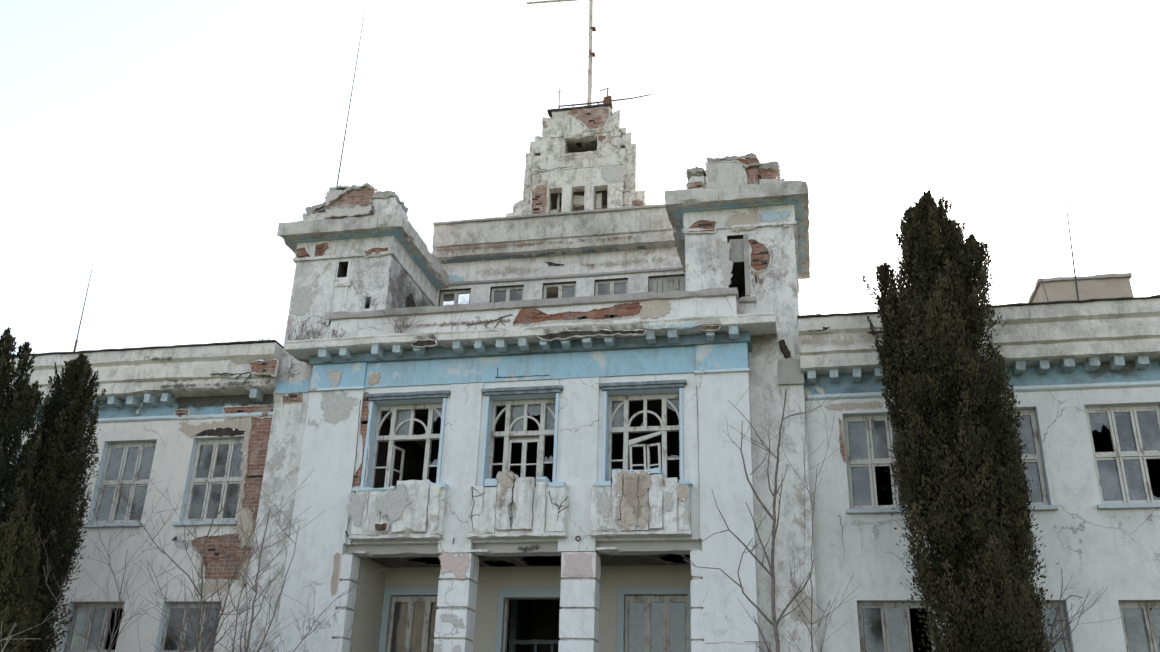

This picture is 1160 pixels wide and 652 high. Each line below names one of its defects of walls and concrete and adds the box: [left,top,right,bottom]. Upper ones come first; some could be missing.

flaking render [733,158,761,167]
flaking render [530,184,549,215]
flaking render [686,181,706,189]
flaking render [682,211,791,286]
flaking render [512,299,673,341]
peeling [308,370,412,533]
flaking render [174,359,305,597]
peeling [595,467,651,530]
peeling [438,551,471,580]
peeling [440,611,464,629]